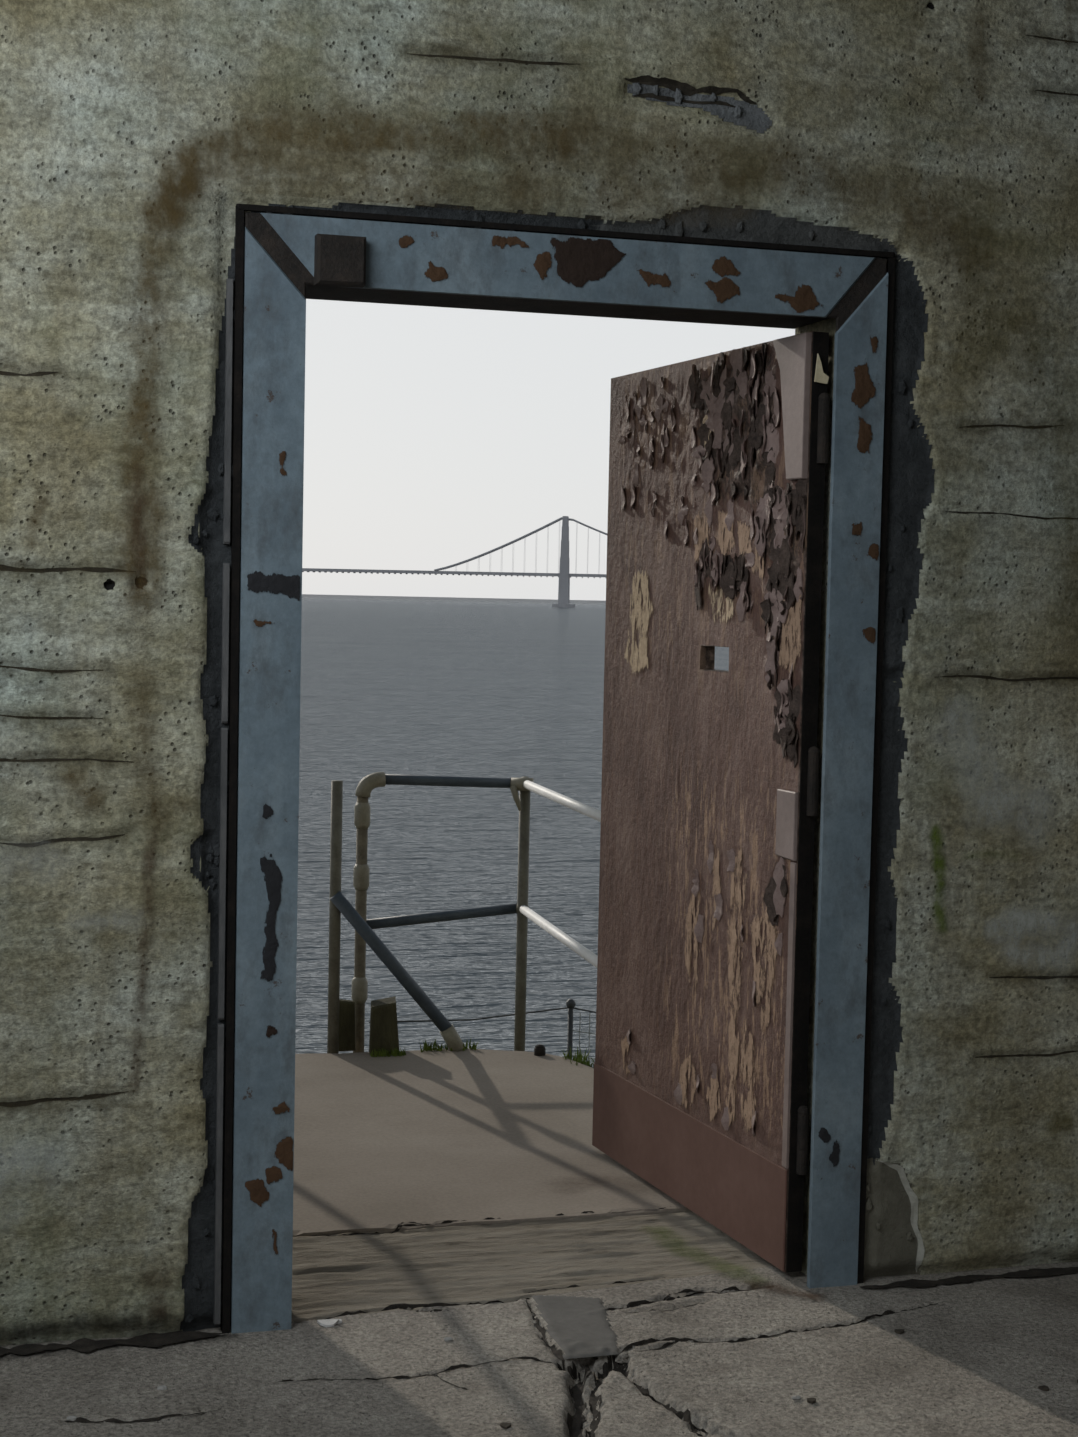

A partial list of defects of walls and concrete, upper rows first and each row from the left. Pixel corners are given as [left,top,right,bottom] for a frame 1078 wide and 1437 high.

corrosion [399,235,414,248]
corrosion [424,261,448,282]
corrosion [492,235,626,287]
corrosion [636,268,671,288]
corrosion [704,256,740,303]
corrosion [775,284,822,313]
corrosion [851,336,878,454]
corrosion [852,522,879,561]
spalling [180,202,935,1331]
corrosion [272,1101,290,1114]
corrosion [245,1137,293,1207]
crack [277,1267,1078,1437]